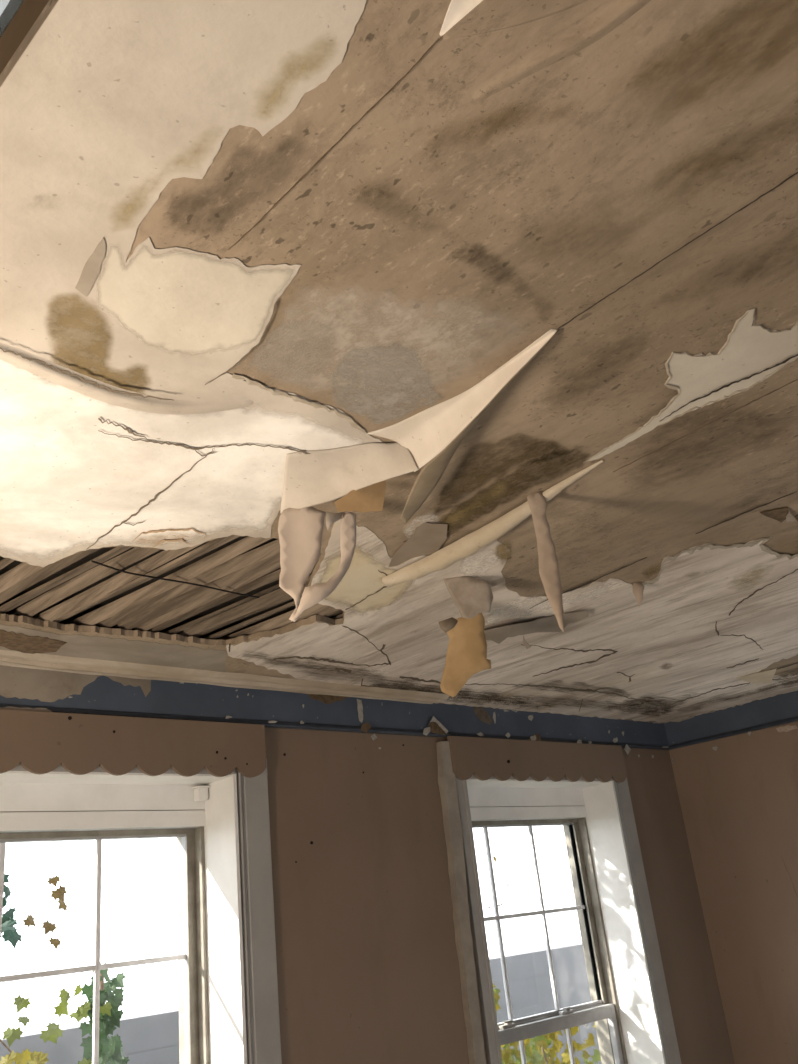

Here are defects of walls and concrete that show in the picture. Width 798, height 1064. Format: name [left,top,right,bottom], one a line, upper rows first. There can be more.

crack [558,172,798,329]
crack [0,348,174,401]
water stain [49,297,147,393]
crack [205,301,277,385]
flaking render [0,0,798,763]
crack [614,354,798,472]
crack [86,418,311,550]
water stain [436,437,587,534]
crack [530,557,647,609]
water stain [247,655,798,716]
crack [274,569,798,711]